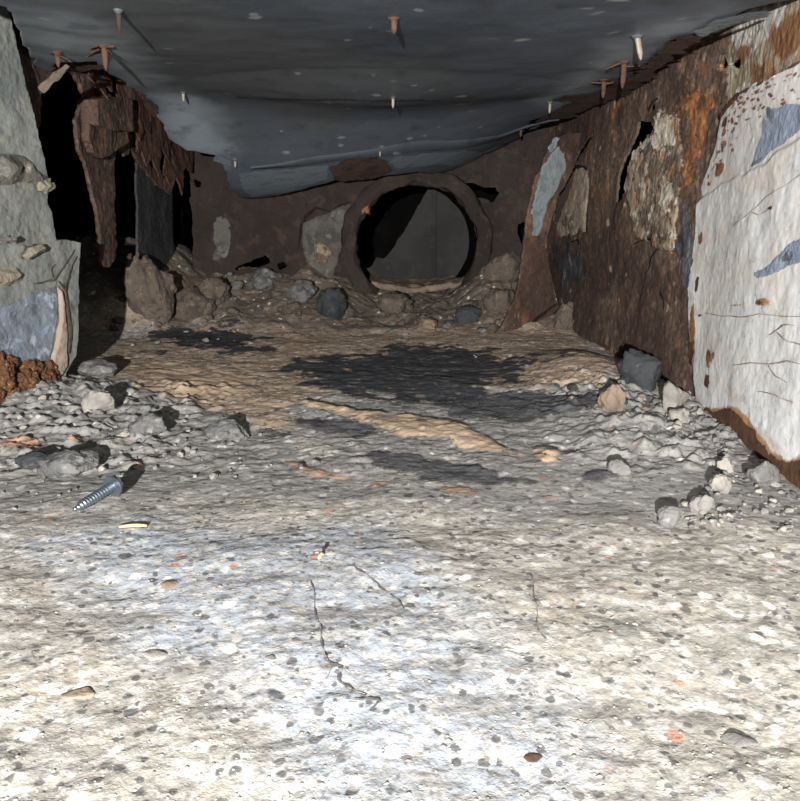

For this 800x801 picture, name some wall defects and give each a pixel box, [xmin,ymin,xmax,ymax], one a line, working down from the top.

rust [528,29,723,129]
peeling [530,137,589,237]
crack [613,98,658,231]
spalling [624,110,684,254]
rust [677,78,786,189]
peeling [752,103,800,166]
peeling [755,240,800,278]
rust [0,350,62,404]
rust [688,304,701,365]
rust [704,349,714,388]
crack [352,563,404,610]
crack [308,576,381,708]